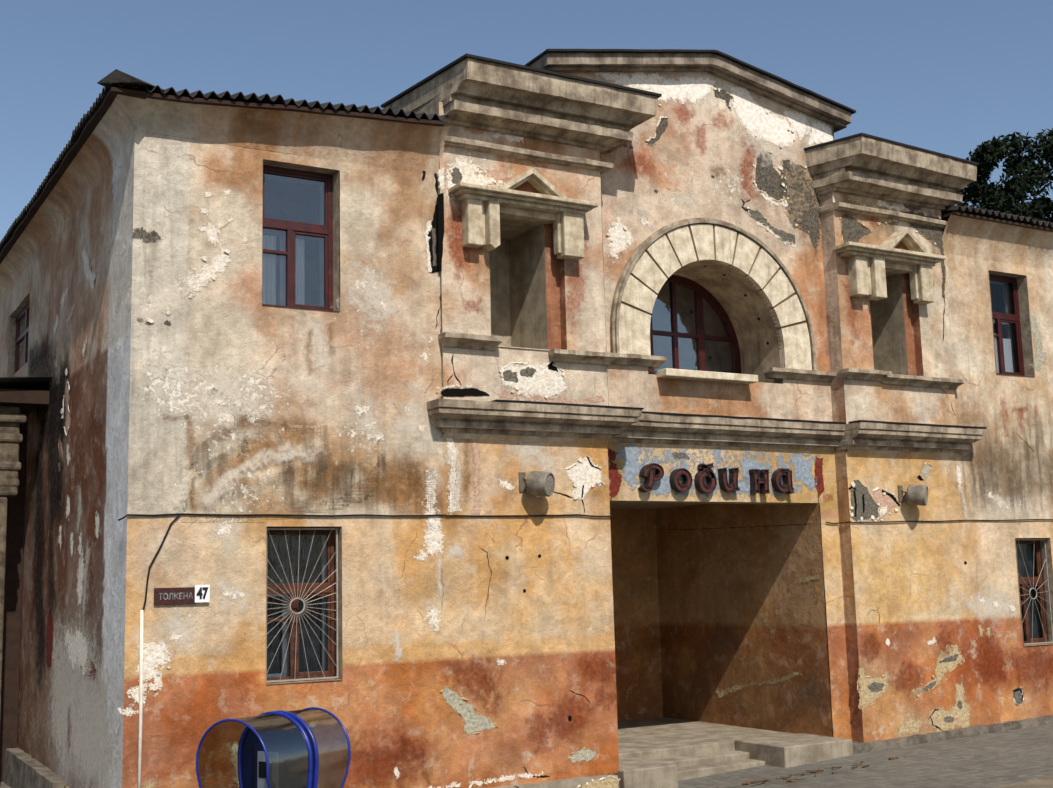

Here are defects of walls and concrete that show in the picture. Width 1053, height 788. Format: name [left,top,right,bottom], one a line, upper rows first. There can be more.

peeling [591,72,833,260]
spalling [423,156,516,273]
peeling [130,189,234,331]
flaking render [437,361,605,405]
leakage [29,340,66,679]
peeling [507,441,644,501]
peeling [652,474,672,497]
flaking render [848,480,900,522]
flaking render [440,686,498,735]
flaking render [857,666,890,710]
flaking render [897,637,972,738]
flaking render [574,775,620,788]